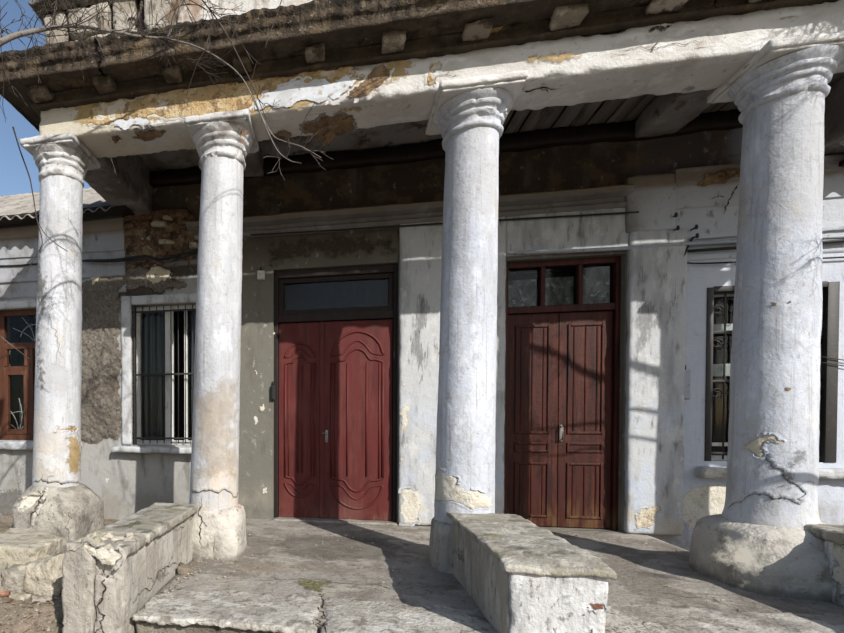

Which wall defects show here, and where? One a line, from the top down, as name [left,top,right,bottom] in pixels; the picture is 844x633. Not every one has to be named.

flaking render [86,63,395,146]
flaking render [123,209,199,284]
flaking render [17,490,44,513]
crack [177,485,239,542]
flaking render [434,466,492,512]
flaking render [633,505,664,533]
crack [726,453,810,508]
crack [95,564,109,633]